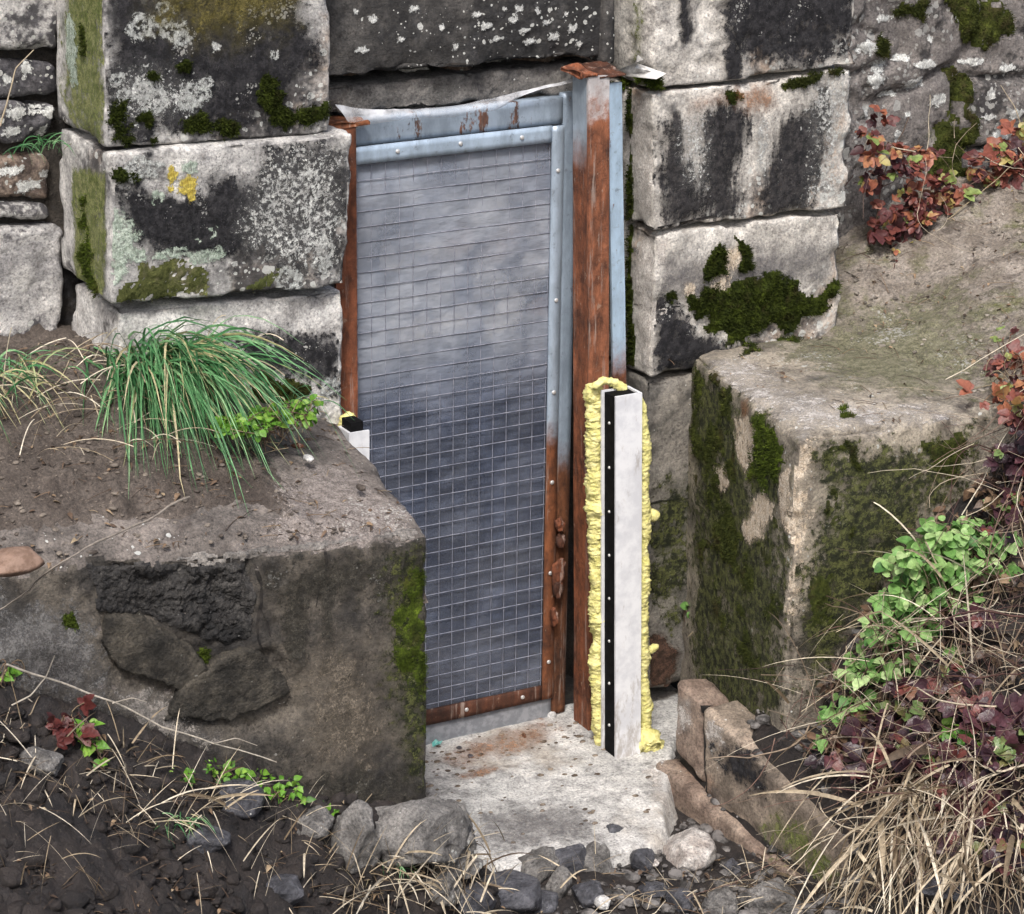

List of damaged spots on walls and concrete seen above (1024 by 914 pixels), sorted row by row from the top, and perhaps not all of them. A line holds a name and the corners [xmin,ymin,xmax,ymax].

spalling [86,450,418,645]
corrosion [550,517,566,627]
peeling [296,642,390,778]
corrosion [446,718,545,777]